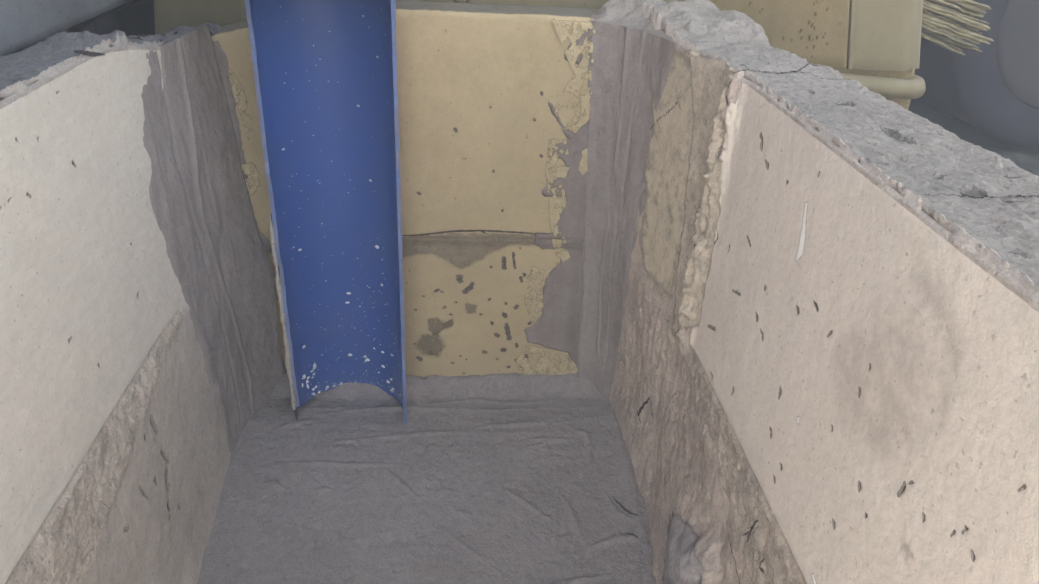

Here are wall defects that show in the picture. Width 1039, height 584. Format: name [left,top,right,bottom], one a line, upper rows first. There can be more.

crack [731,63,850,80]
peeling [540,20,595,264]
crack [925,194,1038,202]
spalling [490,247,533,283]
spalling [442,274,475,315]